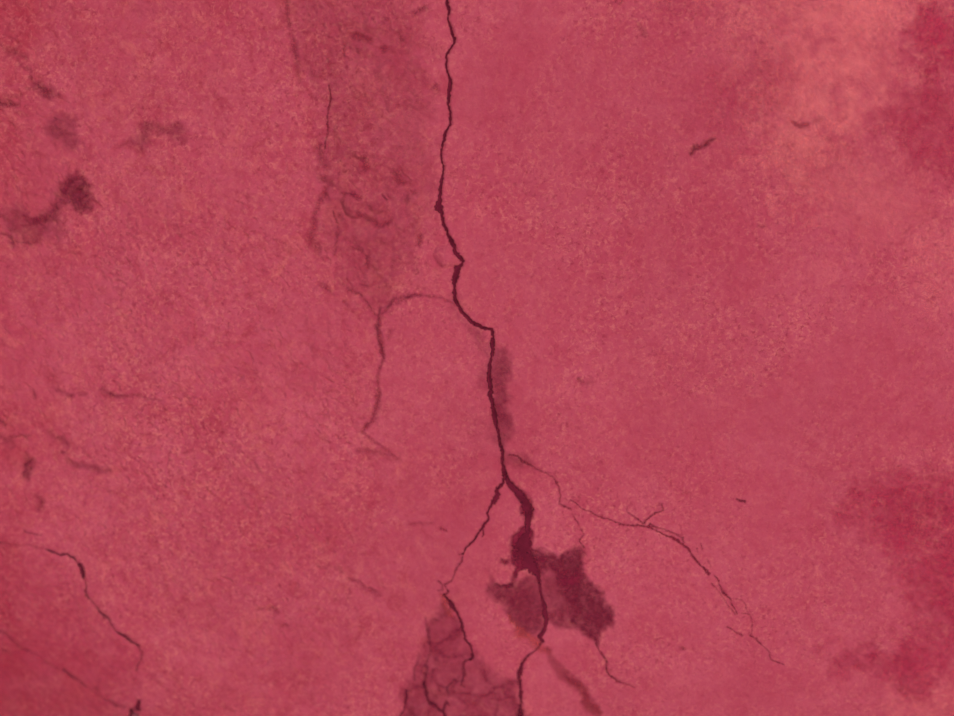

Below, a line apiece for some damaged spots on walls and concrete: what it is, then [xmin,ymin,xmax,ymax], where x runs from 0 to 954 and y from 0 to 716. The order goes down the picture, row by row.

crack [434,0,549,716]
crack [62,554,139,646]
damp [496,482,613,644]
crack [556,481,779,663]
crack [129,701,140,716]
crack [401,683,448,716]